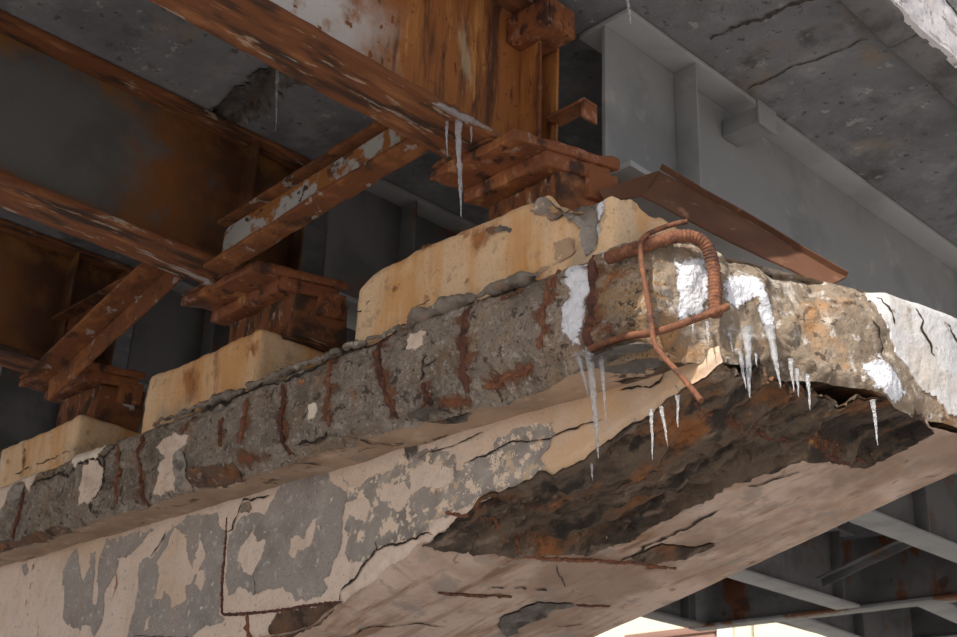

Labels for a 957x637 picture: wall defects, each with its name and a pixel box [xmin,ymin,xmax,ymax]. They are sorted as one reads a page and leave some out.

spalling [210,65,307,126]
crack [872,297,895,355]
crack [916,309,957,356]
peeling [72,443,123,507]
crack [284,431,389,465]
crack [418,419,602,463]
spalling [127,197,935,637]
peeling [62,529,155,637]
crack [339,532,432,602]
crack [491,566,565,591]